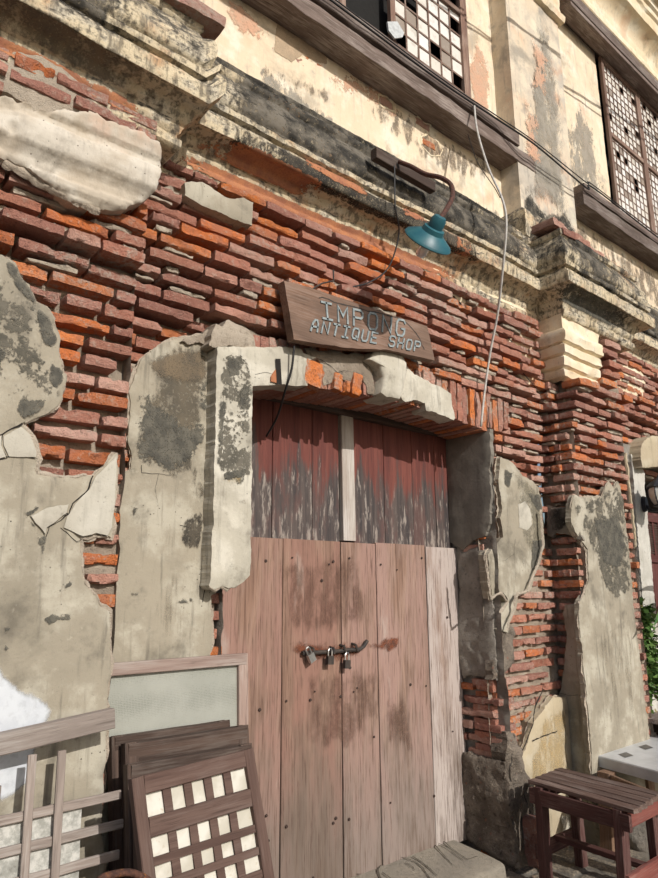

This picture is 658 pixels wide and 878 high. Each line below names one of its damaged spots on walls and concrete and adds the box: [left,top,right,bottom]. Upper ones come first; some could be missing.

damp [0,0,134,87]
peeling [0,37,140,118]
peeling [180,139,454,279]
damp [214,56,529,265]
damp [526,30,658,341]
flaking render [181,324,214,346]
damp [534,314,604,383]
crack [0,423,23,460]
flaking render [0,260,136,607]
damp [218,355,253,484]
crack [46,475,93,542]
flaking render [208,586,237,655]